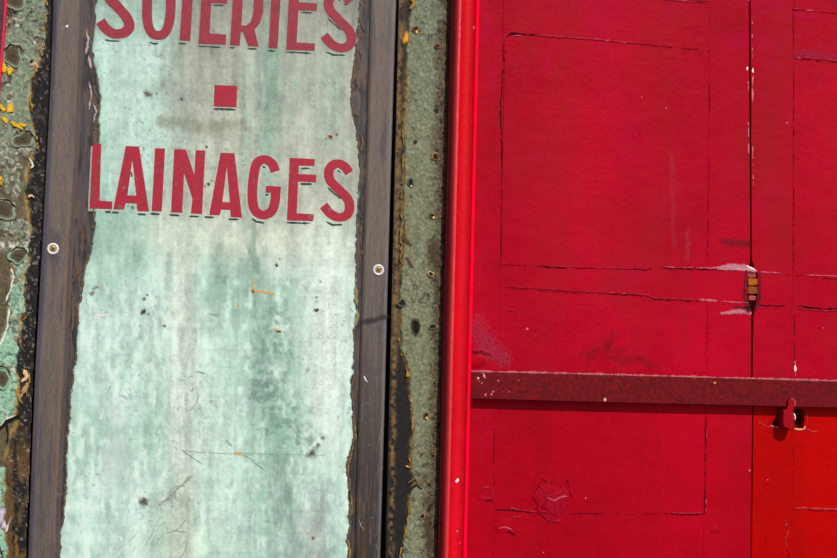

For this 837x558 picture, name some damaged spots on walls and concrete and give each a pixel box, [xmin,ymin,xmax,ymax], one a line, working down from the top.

peeling [85,14,101,229]
crack [499,32,737,271]
crack [762,8,837,280]
peeling [0,263,15,346]
peeling [0,414,21,445]
peeling [59,254,90,558]
peeling [345,0,366,558]
crack [511,286,837,364]